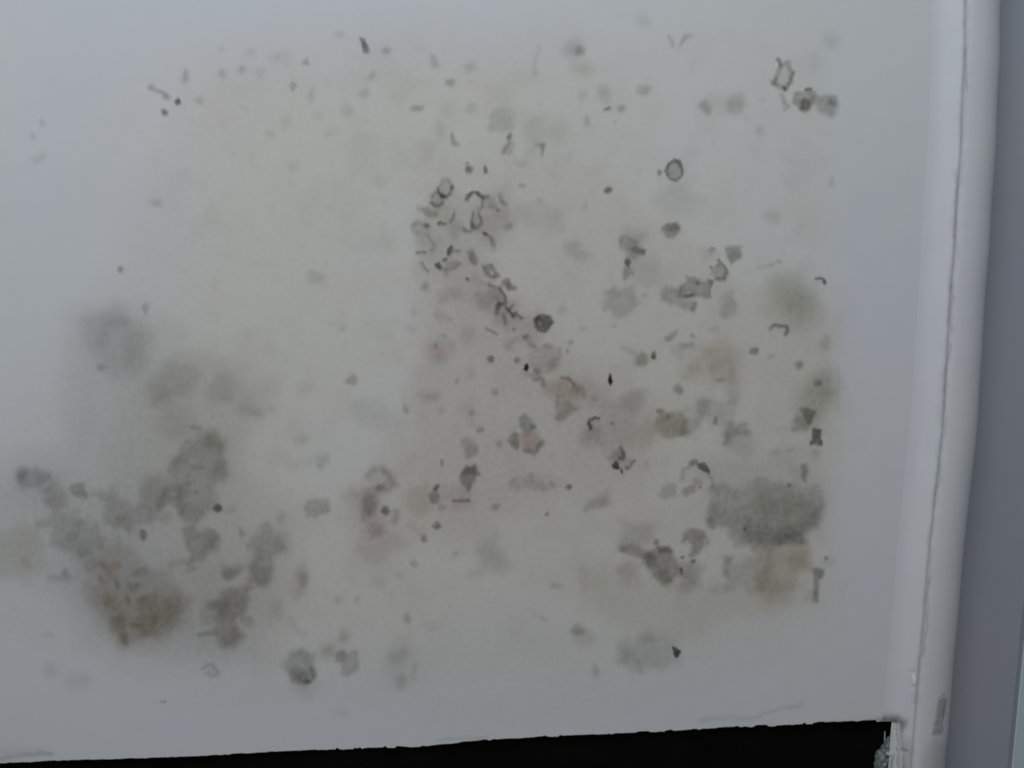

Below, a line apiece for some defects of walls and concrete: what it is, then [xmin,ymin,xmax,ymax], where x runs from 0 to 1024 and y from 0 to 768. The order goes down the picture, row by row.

leakage [805,411,822,444]